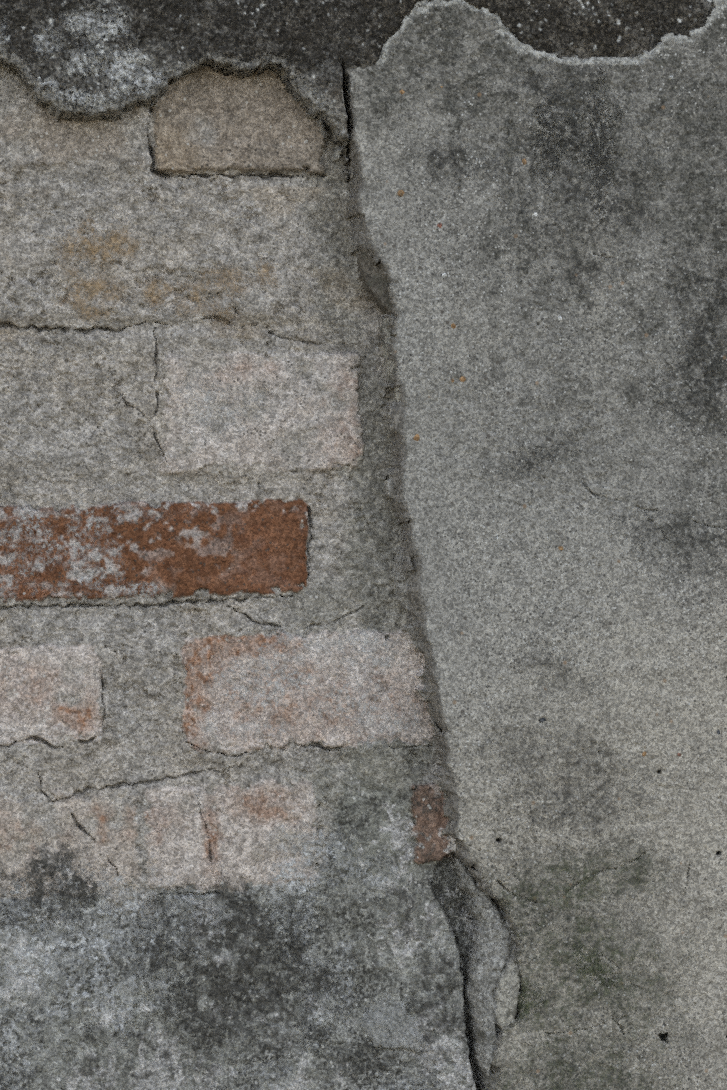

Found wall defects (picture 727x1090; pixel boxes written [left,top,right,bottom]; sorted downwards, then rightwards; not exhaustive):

spalling [0,53,524,1090]